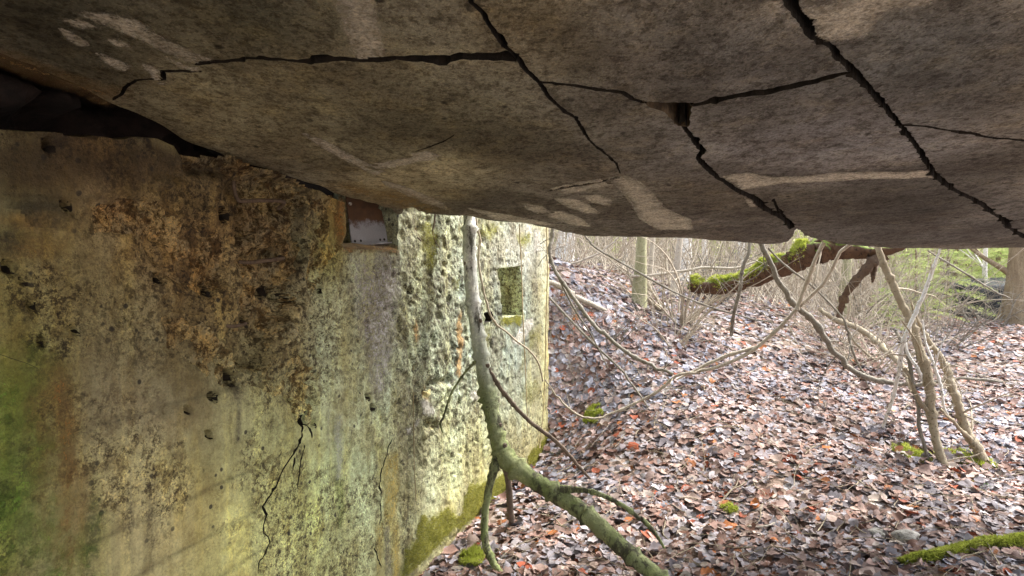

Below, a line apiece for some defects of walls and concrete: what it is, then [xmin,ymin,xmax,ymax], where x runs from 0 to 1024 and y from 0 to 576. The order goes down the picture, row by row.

spalling [180,154,249,178]
crack [112,0,647,191]
crack [679,0,1024,239]
spalling [91,198,230,297]
spalling [254,284,293,304]
spalling [301,195,341,296]
crack [258,411,313,570]